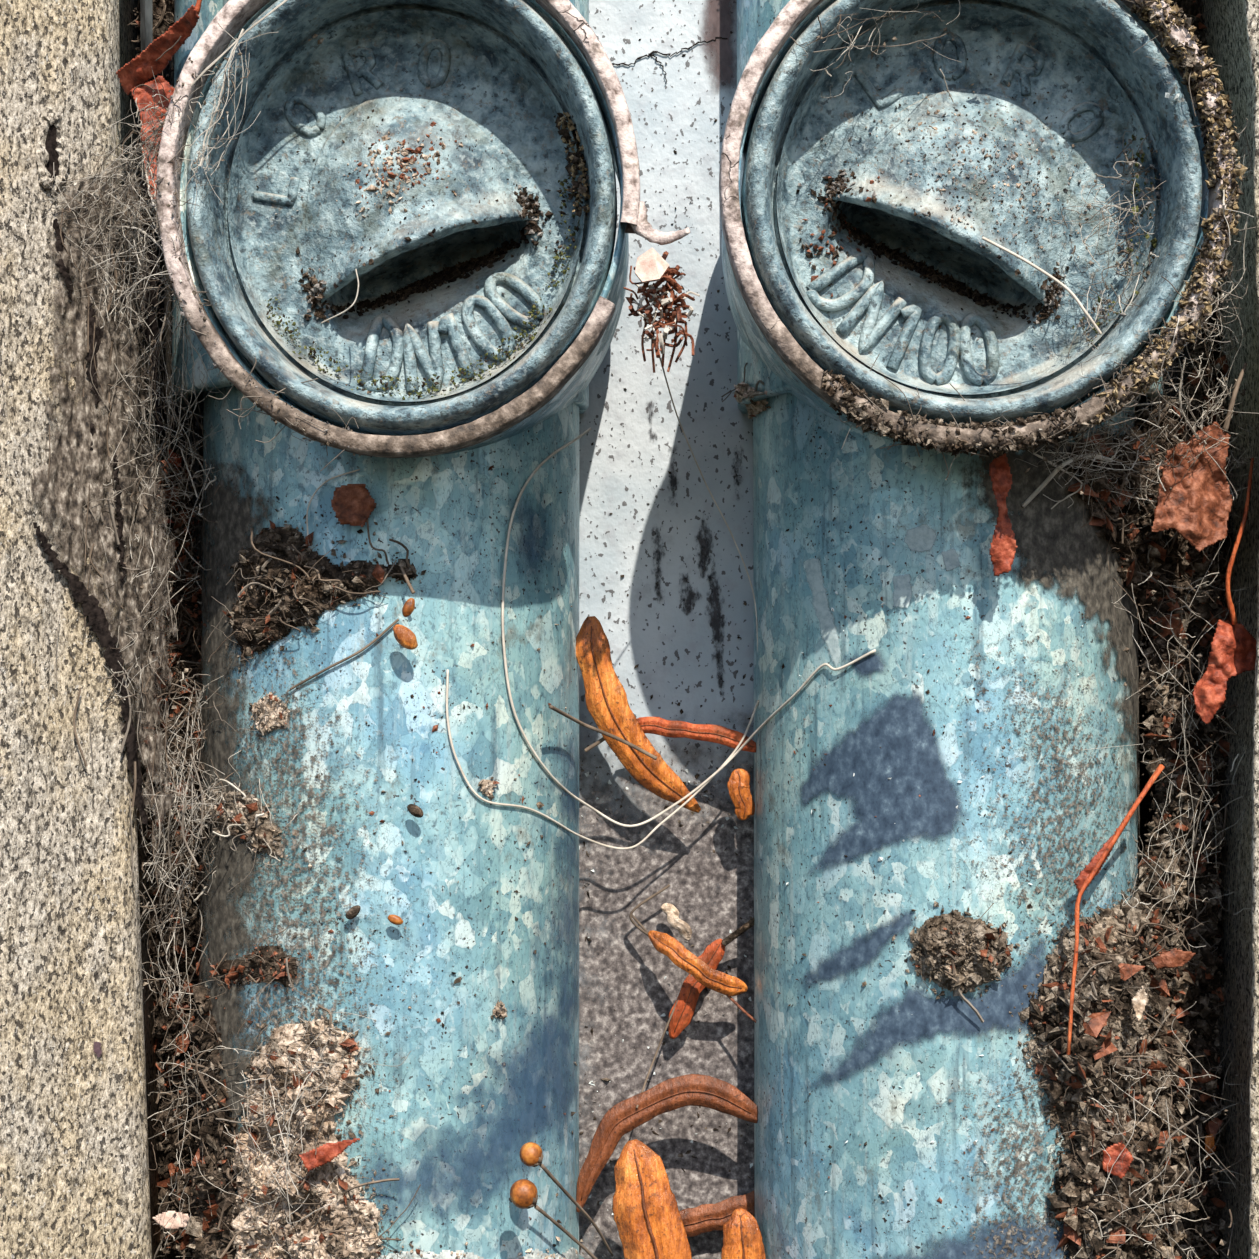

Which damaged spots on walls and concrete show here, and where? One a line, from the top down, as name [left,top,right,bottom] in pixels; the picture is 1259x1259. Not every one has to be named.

crack [612,37,728,84]